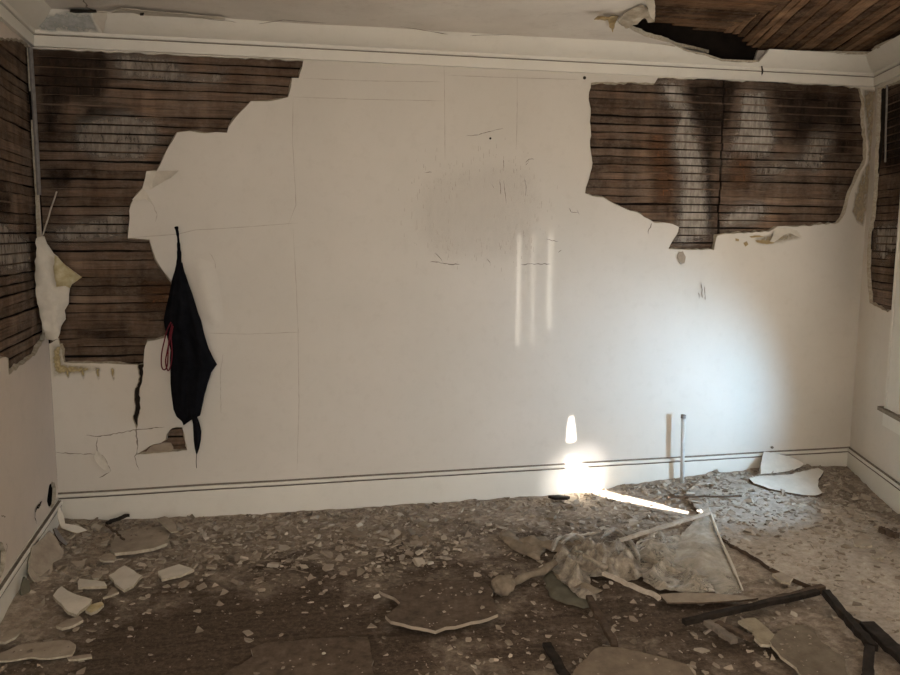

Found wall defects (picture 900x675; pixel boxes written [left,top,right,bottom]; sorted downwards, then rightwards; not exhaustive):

flaking render [594,0,900,62]
flaking render [0,37,303,375]
flaking render [585,78,900,312]
crack [57,363,163,478]
flaking render [137,427,187,455]